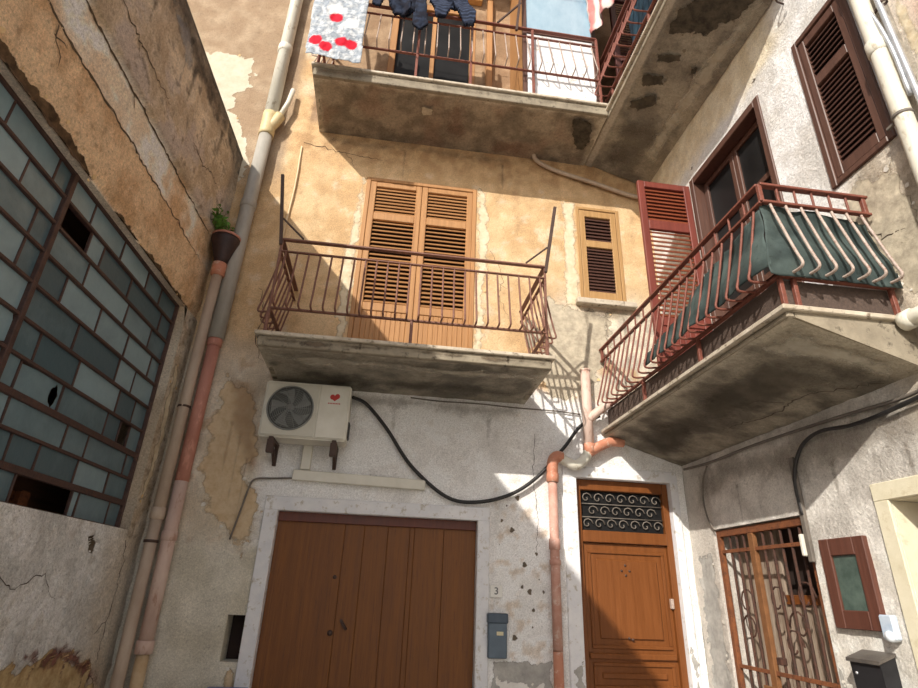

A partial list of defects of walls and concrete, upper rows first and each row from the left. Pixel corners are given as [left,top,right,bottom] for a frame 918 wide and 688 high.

crack [48,0,209,258]
peeling [205,51,257,182]
leakage [768,338,886,373]
peeling [197,372,260,557]
flaking render [0,648,94,688]
peeling [495,676,545,688]